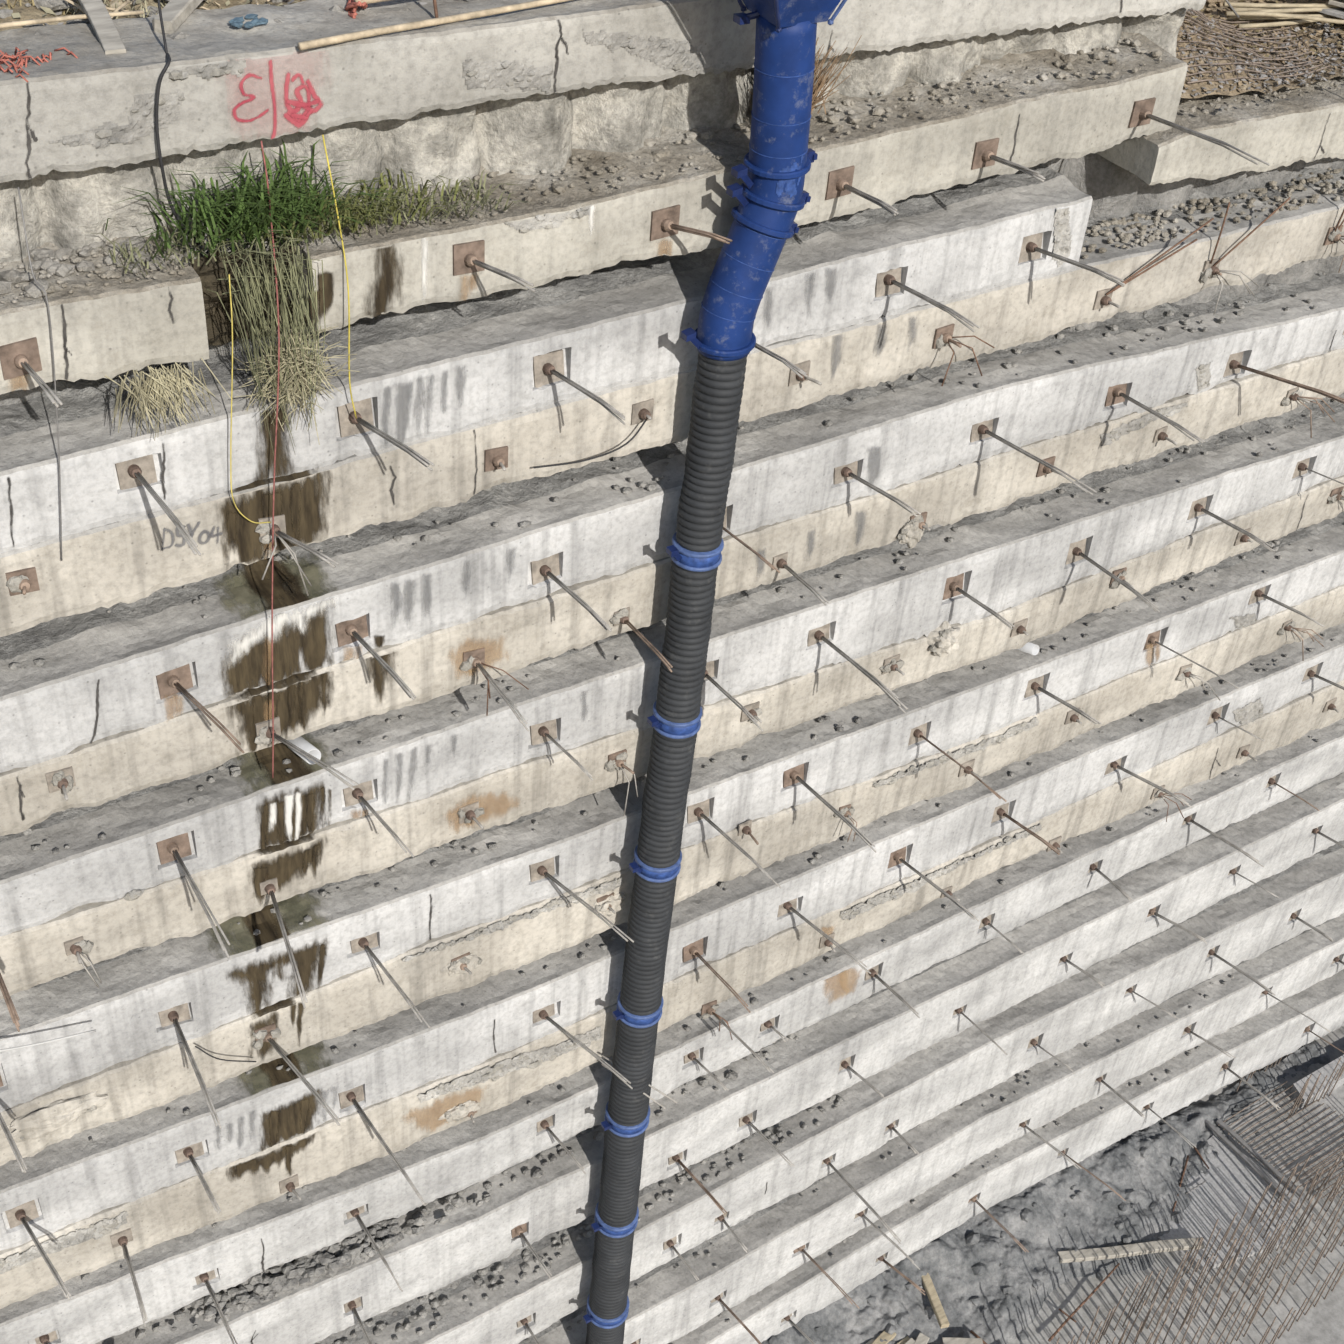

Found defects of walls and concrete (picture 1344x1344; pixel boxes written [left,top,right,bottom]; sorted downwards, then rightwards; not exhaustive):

water stain [221,405,330,564]
water stain [222,600,334,752]
water stain [252,784,331,902]
water stain [229,942,327,1057]
spalling [417,1027,602,1103]
water stain [218,1090,326,1178]